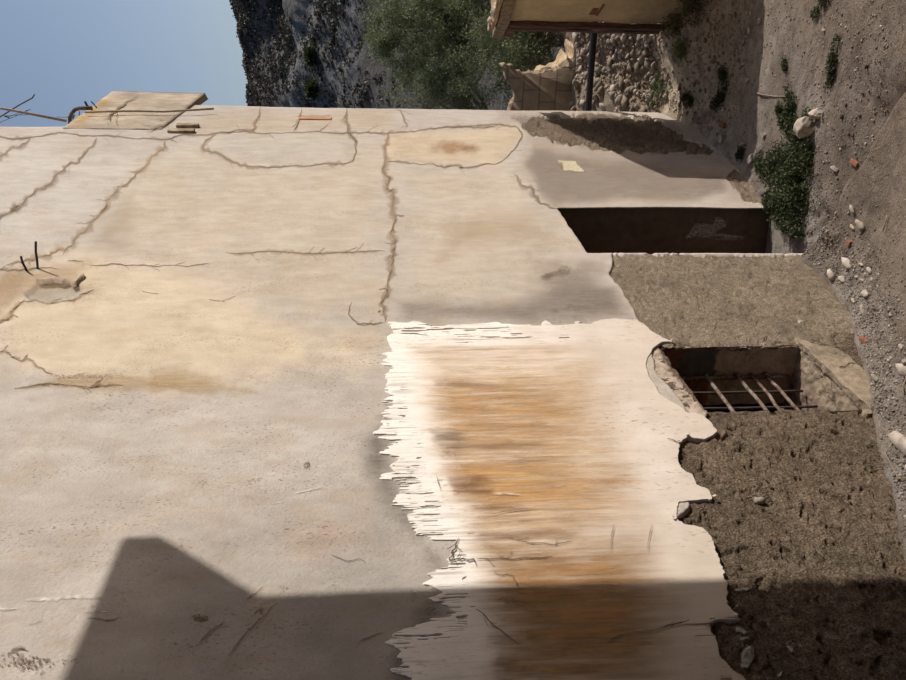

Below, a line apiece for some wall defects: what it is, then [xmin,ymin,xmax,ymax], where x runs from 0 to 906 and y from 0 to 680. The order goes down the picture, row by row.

spalling [510,113,714,155]
crack [0,95,557,326]
spalling [36,273,84,287]
crack [0,345,114,392]
peeling [373,254,906,680]